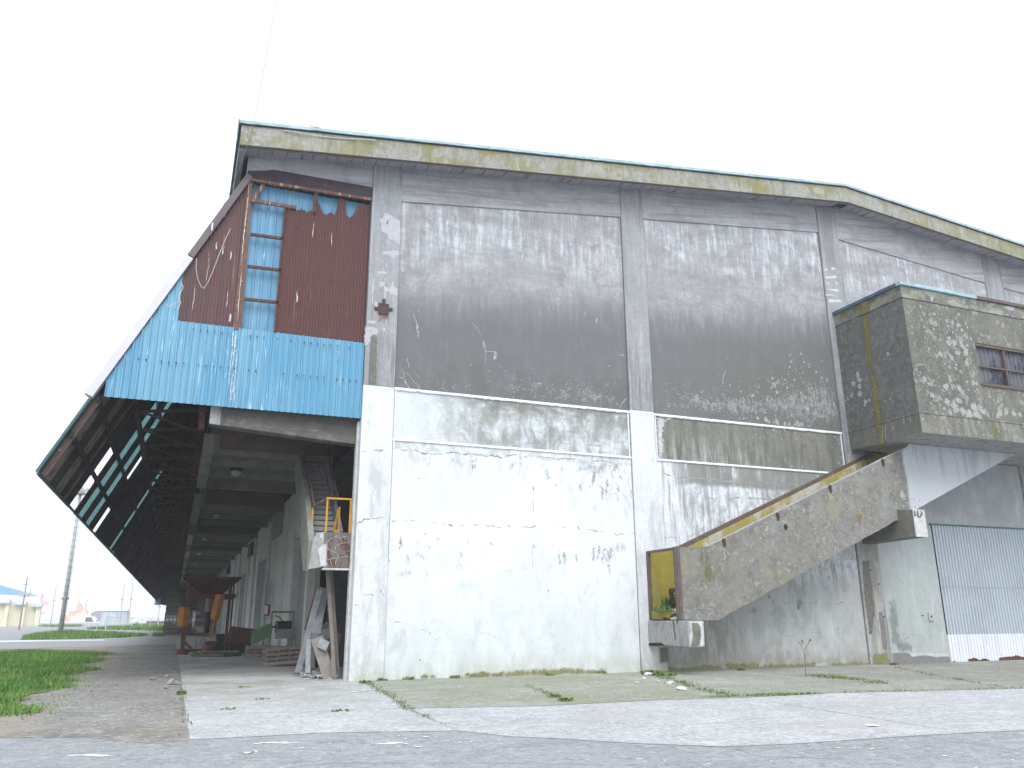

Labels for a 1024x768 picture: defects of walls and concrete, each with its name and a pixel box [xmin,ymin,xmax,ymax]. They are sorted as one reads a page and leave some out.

peeling [372,213,401,307]
leakage [683,378,839,430]